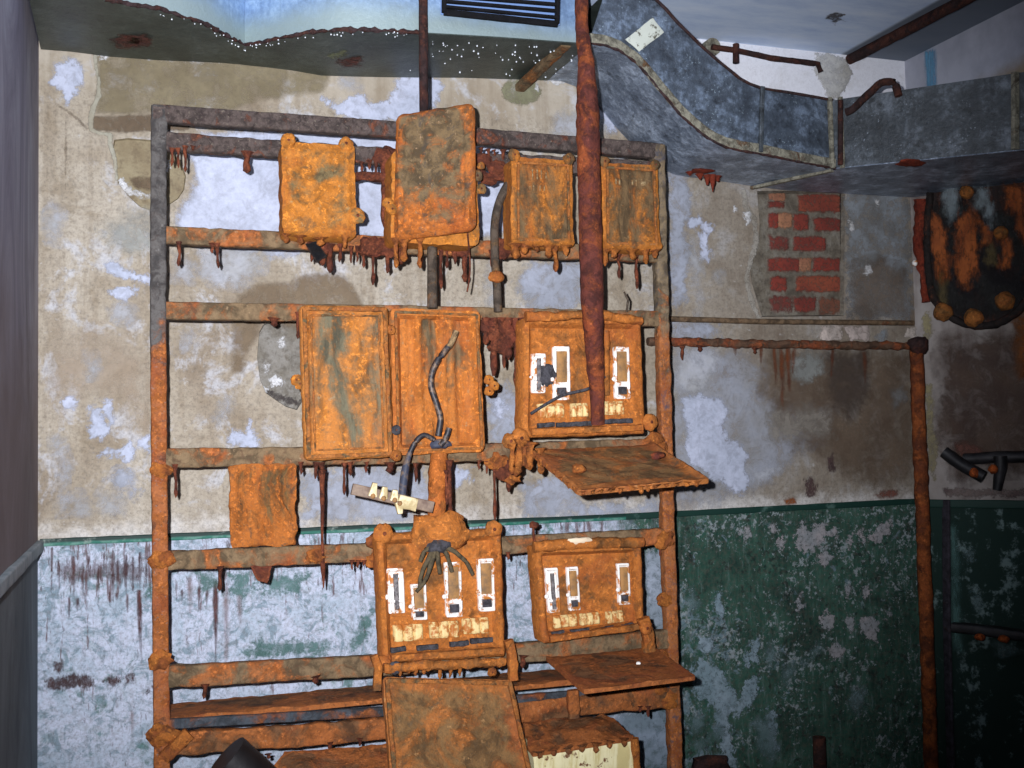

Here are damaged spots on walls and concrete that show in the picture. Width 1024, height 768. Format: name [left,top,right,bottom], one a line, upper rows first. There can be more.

corrosion [105,0,419,46]
flaking render [48,52,151,210]
peeling [667,172,713,306]
flaking render [733,190,887,342]
corrosion [103,550,177,634]
corrosion [198,566,226,651]
flaking render [257,322,302,410]
peeling [672,322,819,501]
leakage [784,477,818,504]
peeling [768,519,893,568]
leakage [767,350,913,498]
peeling [689,630,780,768]